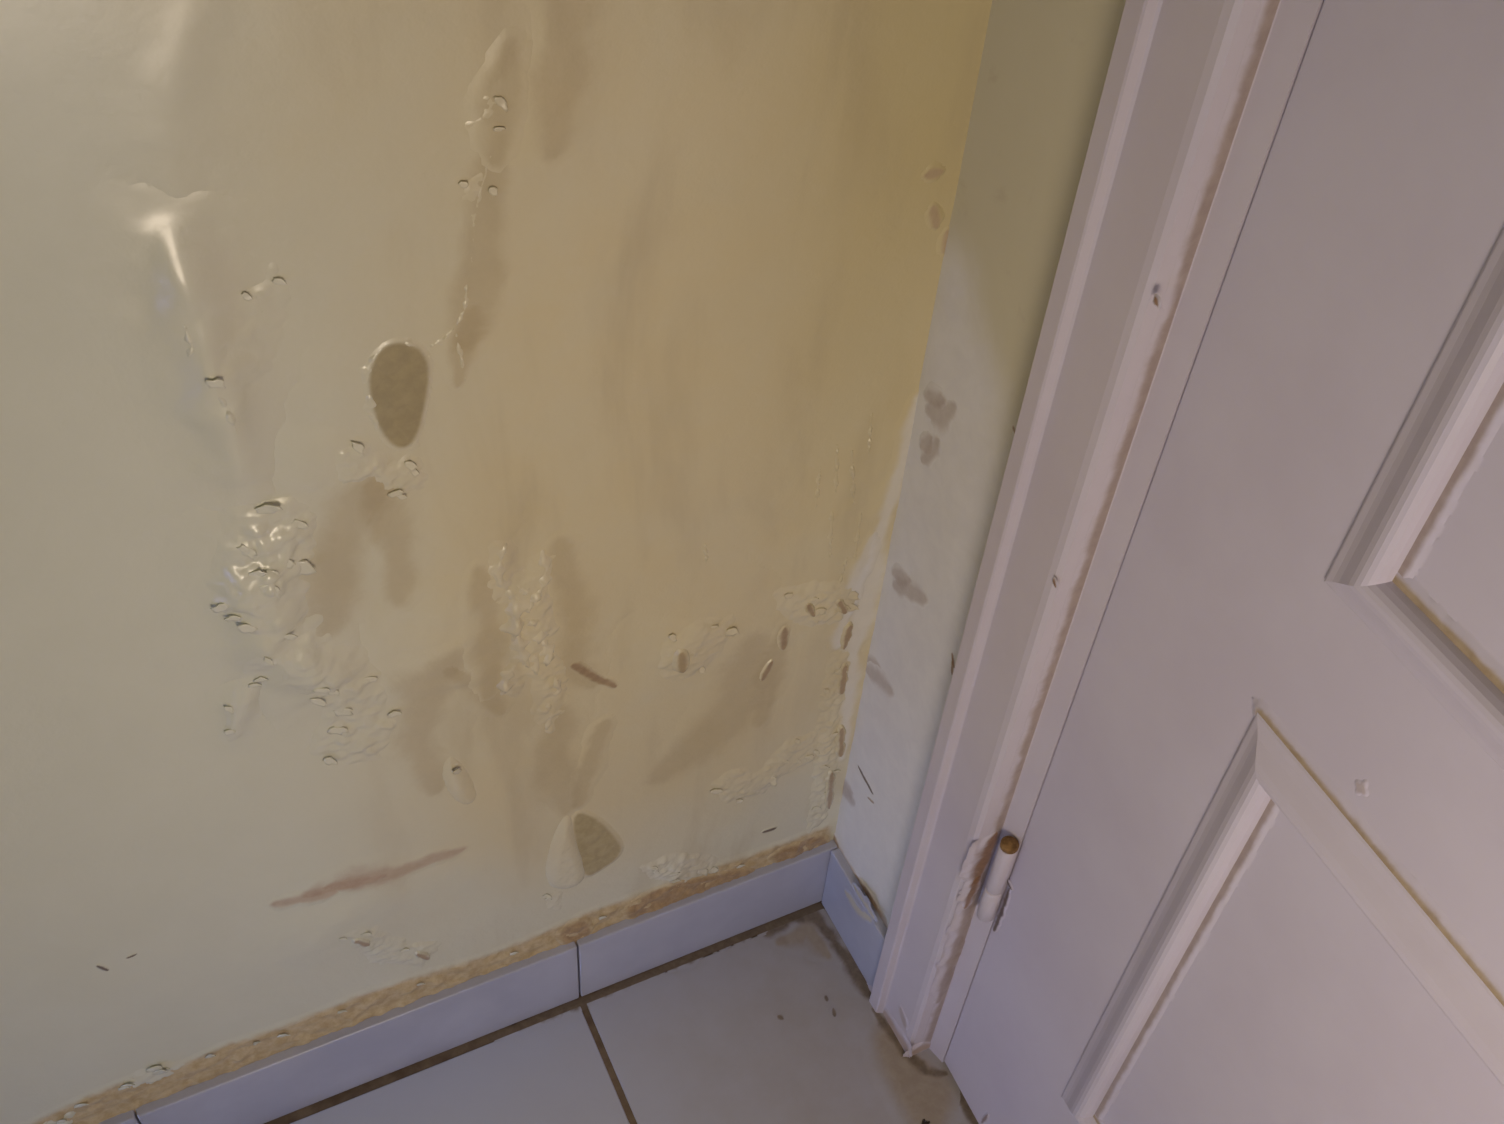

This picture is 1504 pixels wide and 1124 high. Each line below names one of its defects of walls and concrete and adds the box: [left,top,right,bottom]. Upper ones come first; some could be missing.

damp [427,0,636,393]
peeling [358,337,434,452]
damp [275,450,517,803]
damp [514,528,619,822]
damp [637,613,798,792]
damp [818,192,1029,923]
corrosion [265,842,471,912]
flaking render [19,809,889,1124]
damp [929,869,987,1004]